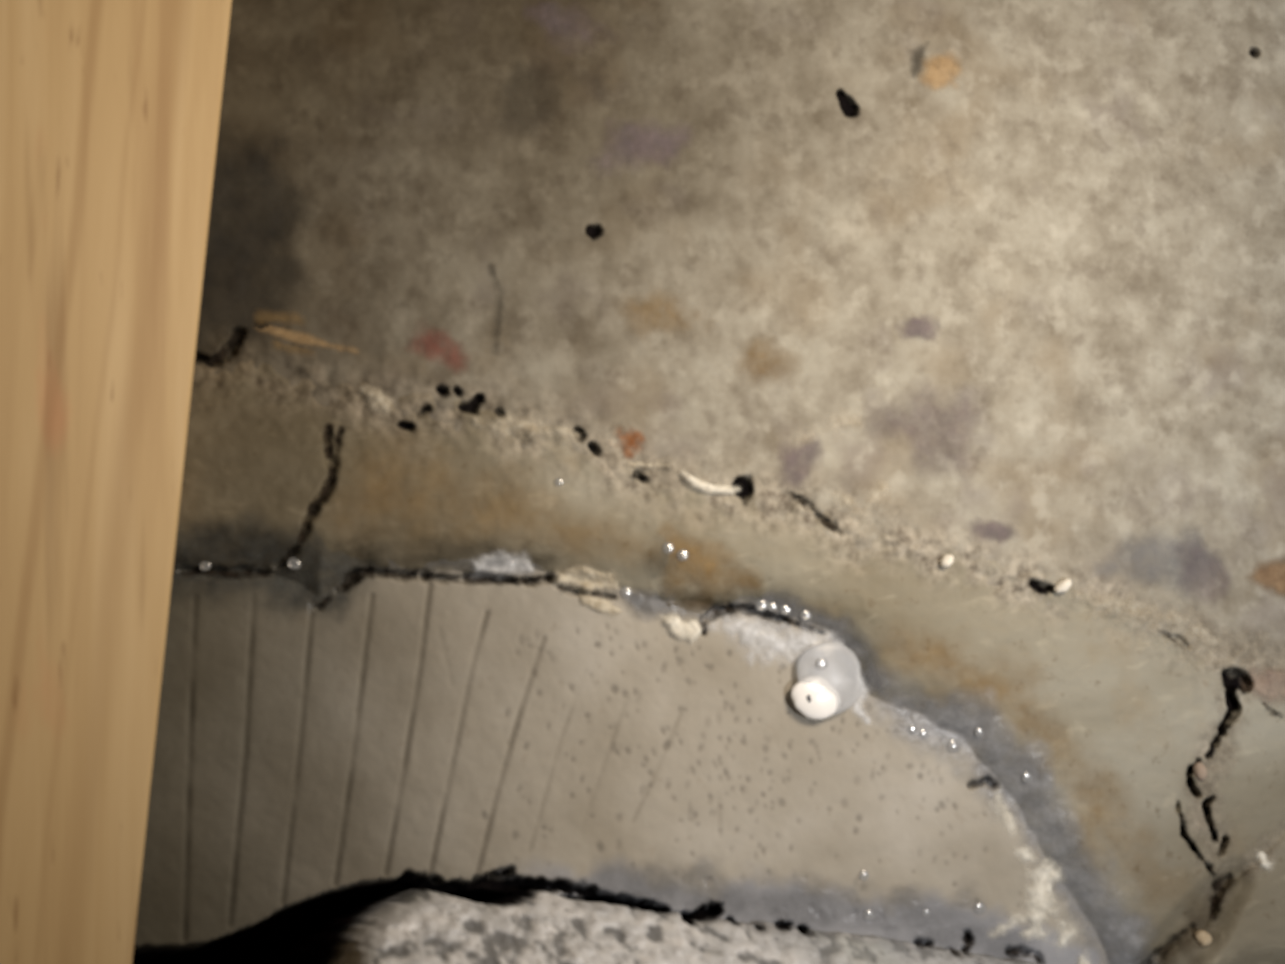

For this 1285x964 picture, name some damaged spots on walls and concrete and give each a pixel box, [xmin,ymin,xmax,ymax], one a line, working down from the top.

crack [195,331,245,366]
crack [190,424,345,578]
leakage [557,567,701,641]
spalling [1029,580,1052,594]
leakage [714,595,1142,964]
crack [1158,669,1278,953]
hole [132,881,393,964]